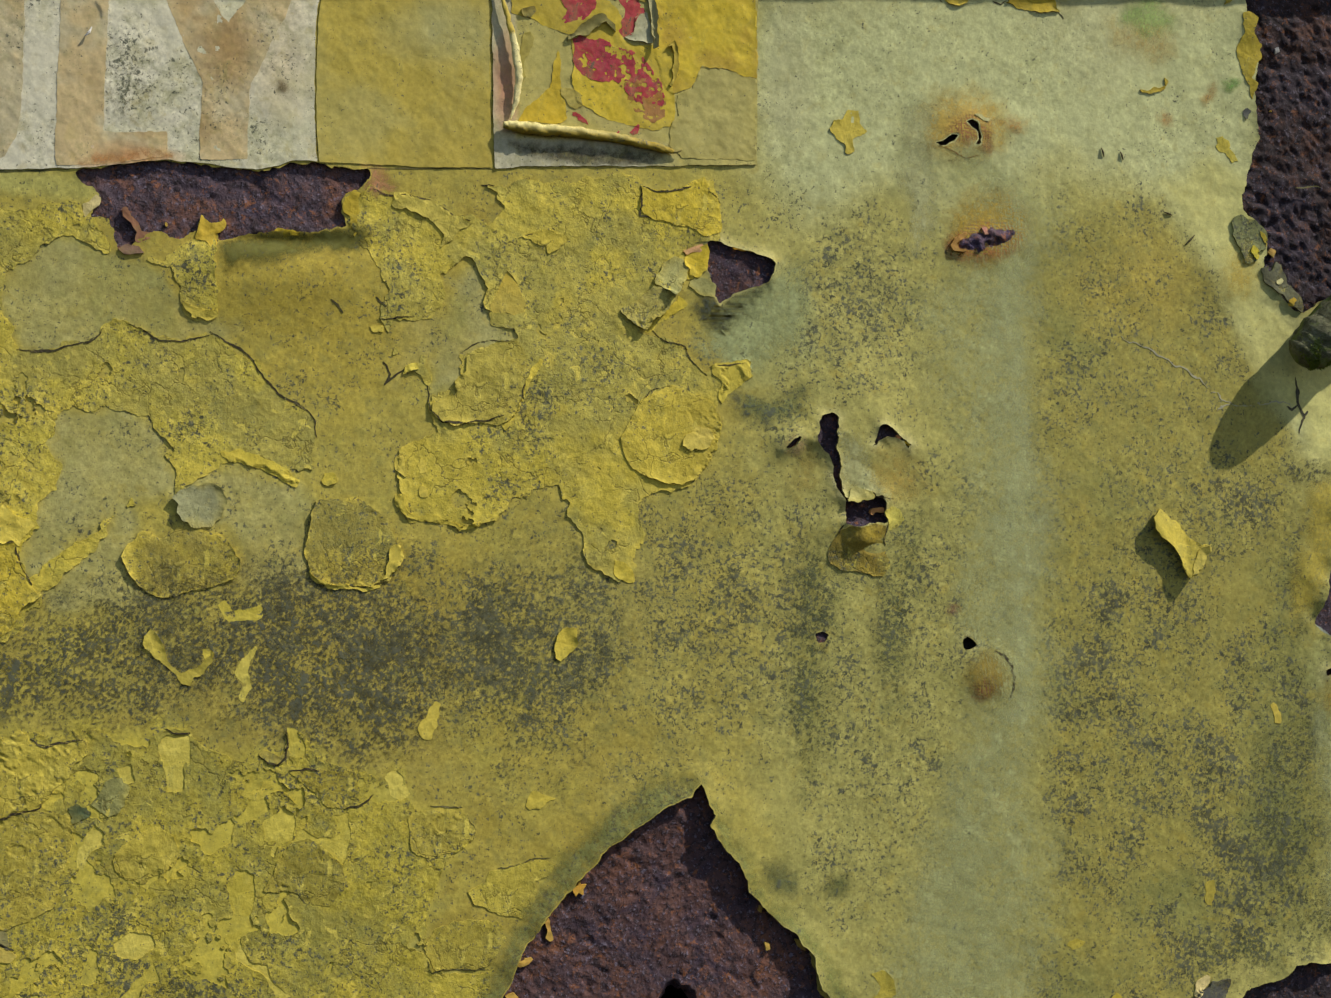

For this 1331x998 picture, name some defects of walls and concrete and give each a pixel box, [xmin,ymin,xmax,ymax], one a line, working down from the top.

rust [76,153,391,255]
rust [929,98,1020,152]
rust [1242,0,1331,312]
rust [683,241,775,303]
crack [17,324,317,437]
peeling [0,172,753,643]
peeling [847,486,875,503]
peeling [827,507,904,576]
peeling [143,627,214,686]
peeling [554,628,579,661]
peeling [0,727,556,998]
rust [503,785,829,998]